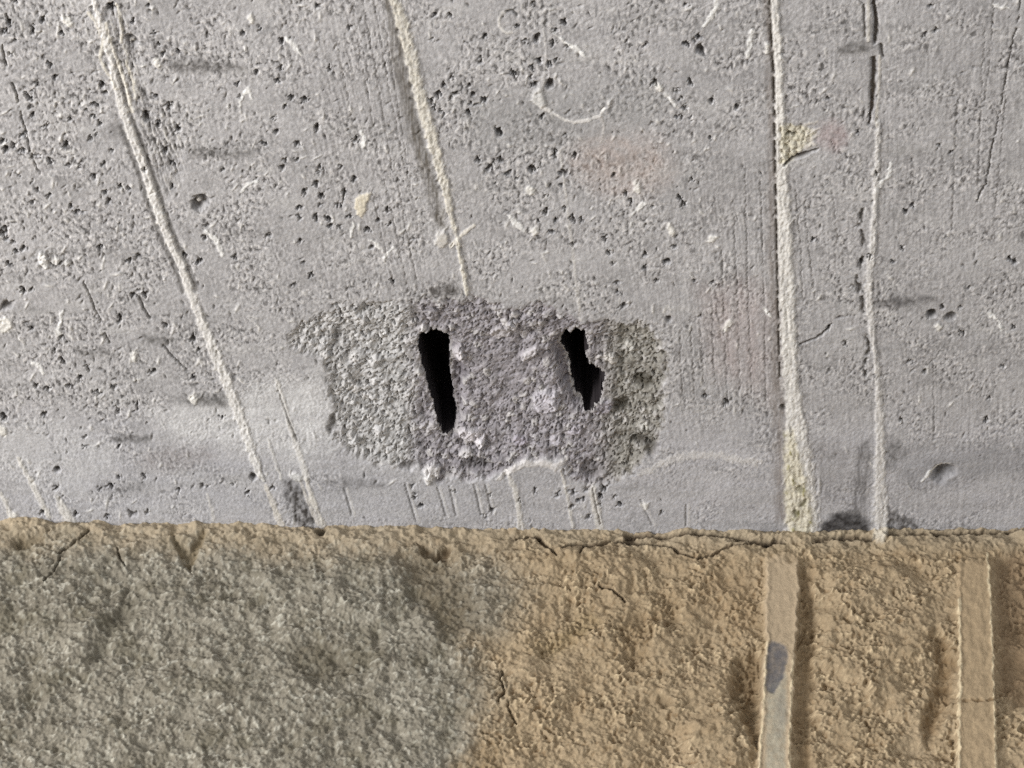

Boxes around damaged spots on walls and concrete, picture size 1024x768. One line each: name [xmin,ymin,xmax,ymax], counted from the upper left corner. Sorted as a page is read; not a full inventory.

spalling [290,296,671,520]
crack [43,527,91,581]
crack [116,546,126,567]
crack [516,529,787,560]
crack [813,527,1024,544]
crack [598,580,627,603]